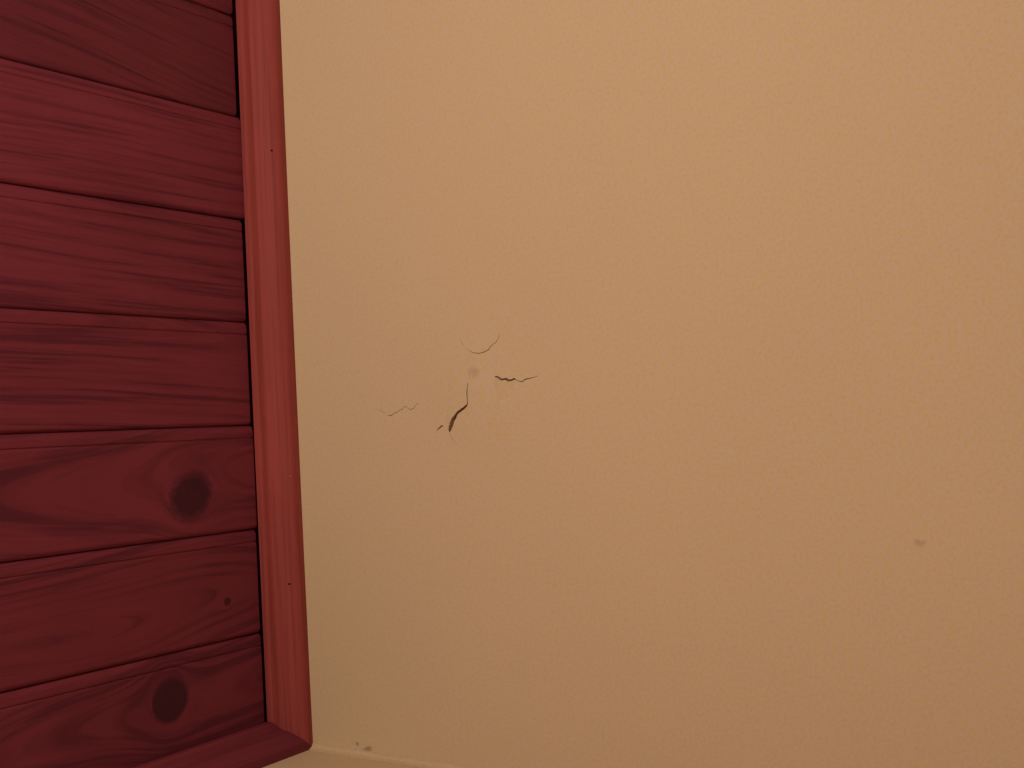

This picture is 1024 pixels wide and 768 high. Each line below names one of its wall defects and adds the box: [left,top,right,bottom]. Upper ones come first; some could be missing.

crack [438,386,468,432]
crack [494,376,534,400]